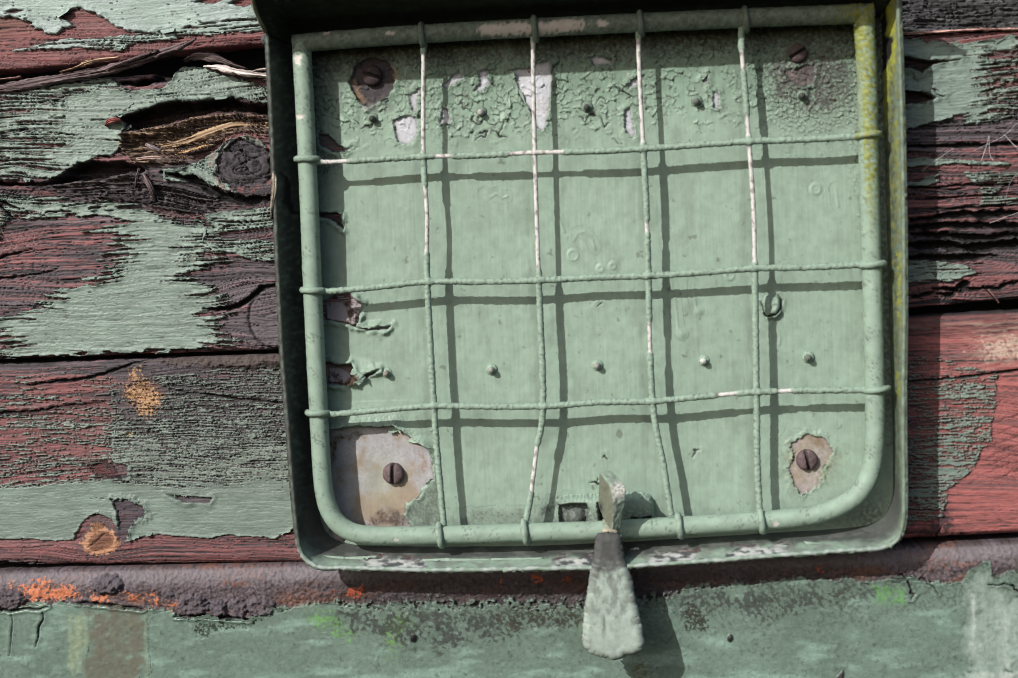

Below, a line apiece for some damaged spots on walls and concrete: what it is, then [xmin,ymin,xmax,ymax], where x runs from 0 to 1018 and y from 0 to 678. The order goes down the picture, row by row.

peeling [0,0,264,72]
peeling [0,66,268,183]
crack [354,111,375,131]
crack [469,114,512,142]
crack [550,53,562,93]
crack [576,83,657,146]
peeling [903,31,1018,134]
peeling [0,193,294,546]
peeling [329,422,436,523]
peeling [905,348,1002,531]
rust [0,565,590,625]
rust [629,543,1018,602]